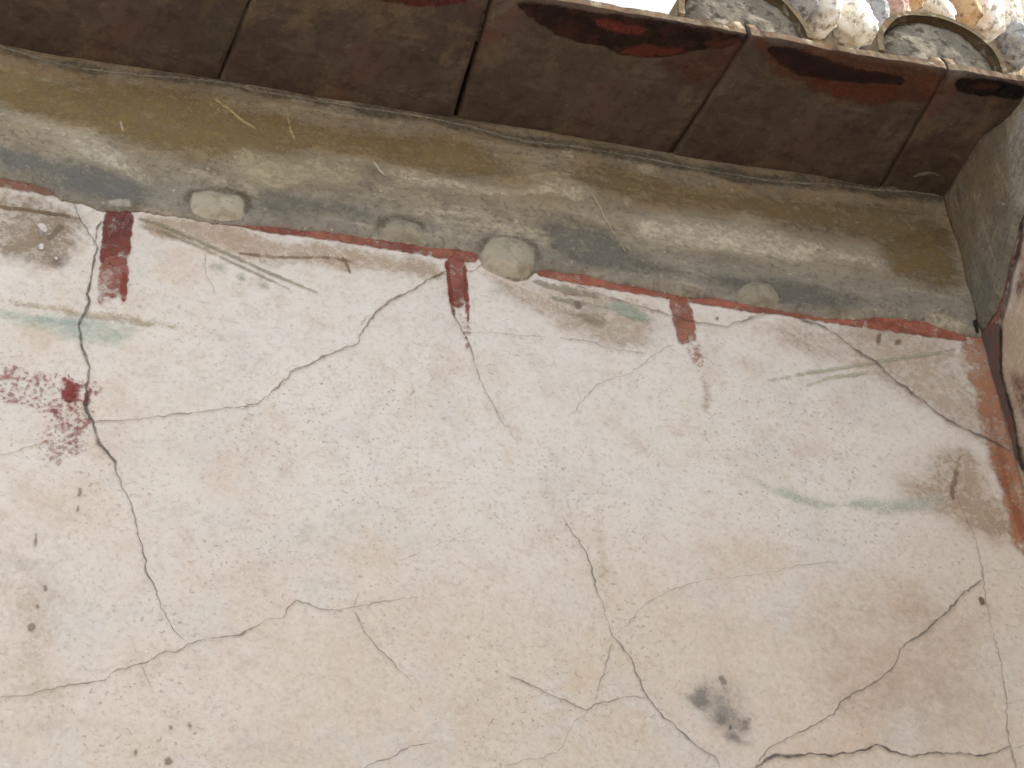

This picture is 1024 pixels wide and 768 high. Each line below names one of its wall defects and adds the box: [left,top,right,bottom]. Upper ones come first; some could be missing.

leakage [0,60,957,287]
crack [78,217,118,476]
crack [237,272,443,408]
crack [800,216,1024,472]
crack [121,519,246,673]
crack [565,521,596,582]
crack [558,640,690,740]
crack [756,575,986,767]